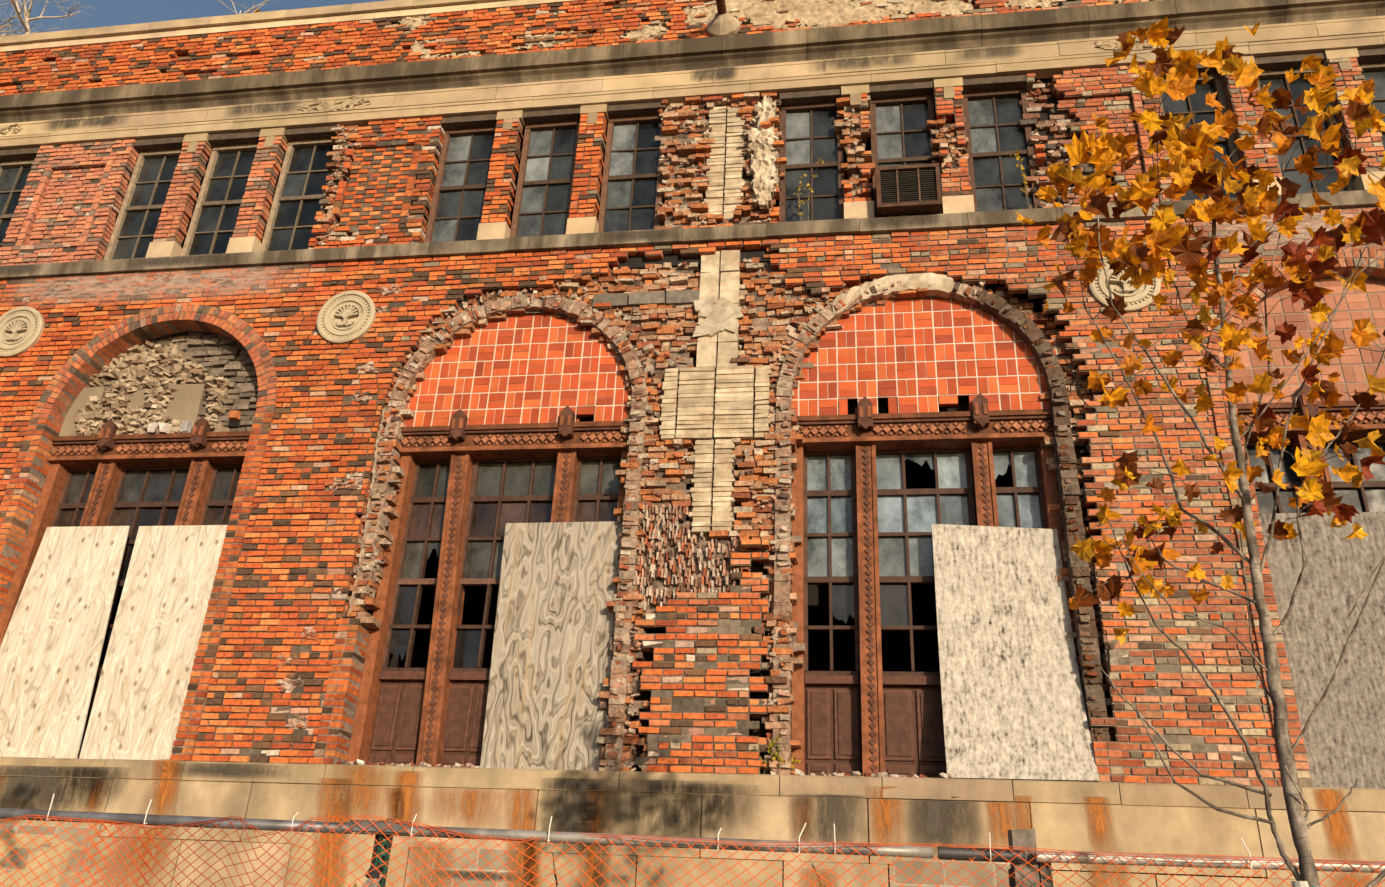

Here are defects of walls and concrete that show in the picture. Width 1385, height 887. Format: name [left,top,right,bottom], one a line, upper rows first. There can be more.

peeling [615,0,973,42]
spalling [297,95,372,246]
spalling [655,92,785,228]
spalling [1019,80,1096,209]
spalling [324,247,1115,775]
rust [138,759,179,867]
rust [314,766,419,887]
damp [549,778,600,833]
damp [616,780,740,832]
rust [872,786,900,841]
rust [989,796,1032,842]
rust [1316,789,1353,857]